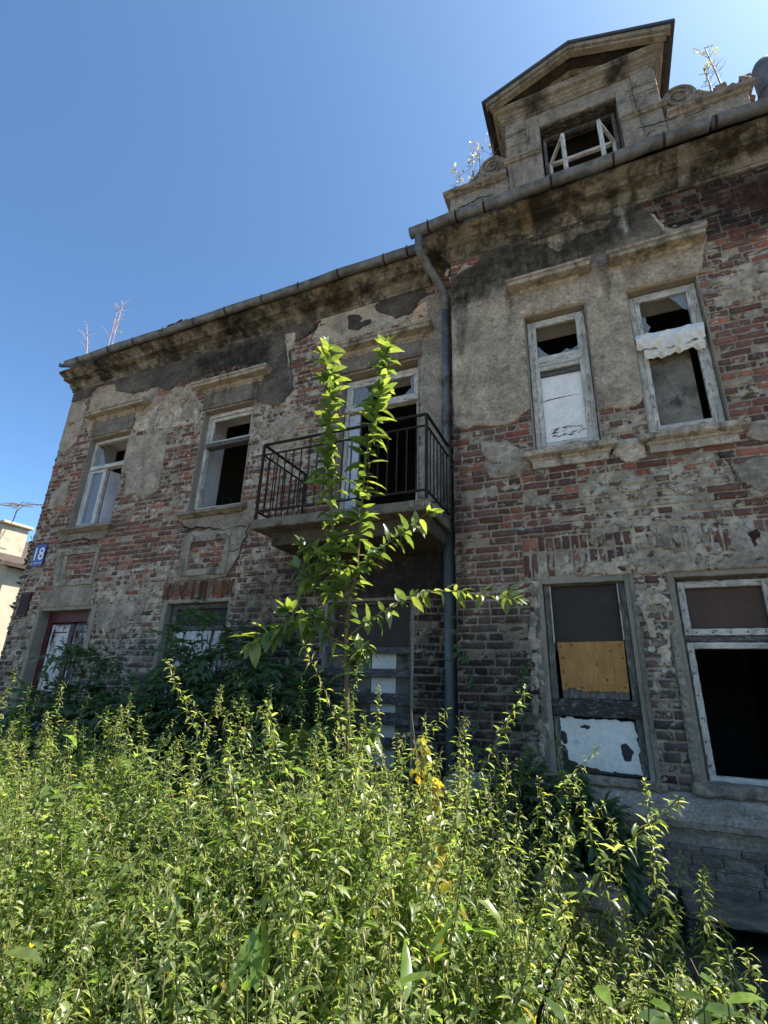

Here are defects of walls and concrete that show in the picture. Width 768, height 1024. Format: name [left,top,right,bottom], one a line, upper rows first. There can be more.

leakage [453,208,639,302]
peeling [650,214,708,233]
peeling [285,301,431,367]
peeling [133,382,201,432]
crack [180,522,249,575]
spalling [748,529,760,547]
peeling [633,578,672,673]
peeling [527,580,550,758]